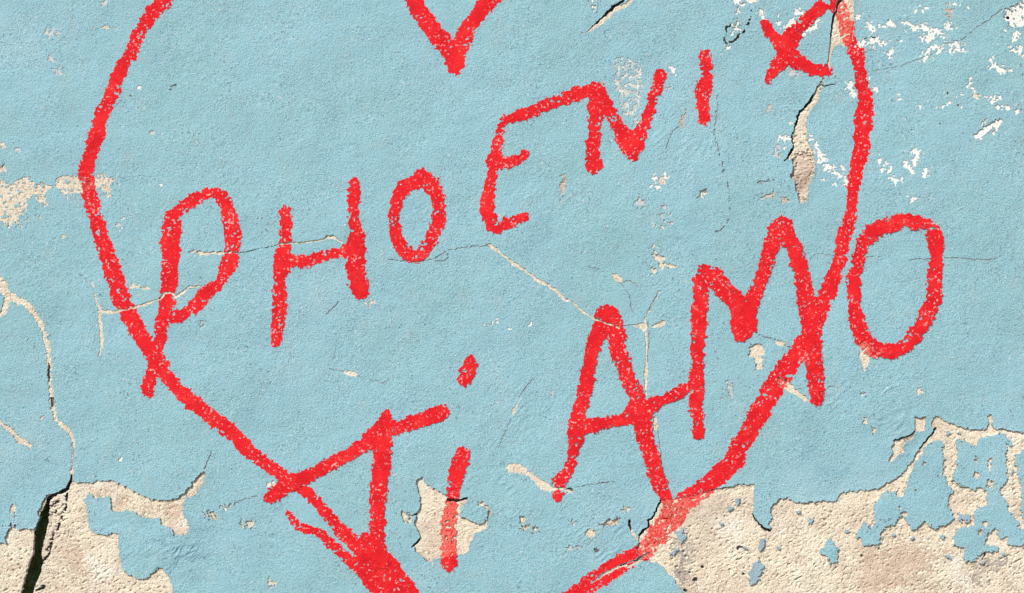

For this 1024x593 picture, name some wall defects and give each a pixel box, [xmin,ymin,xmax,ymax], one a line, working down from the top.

crack [581,0,633,34]
peeling [1003,0,1024,58]
spalling [723,0,969,204]
peeling [0,163,115,230]
crack [189,235,345,256]
crack [91,281,202,358]
crack [388,243,669,493]
crack [0,276,76,593]
peeling [0,471,205,593]
peeling [396,477,491,561]
crack [591,519,650,583]
peeling [638,414,1024,593]